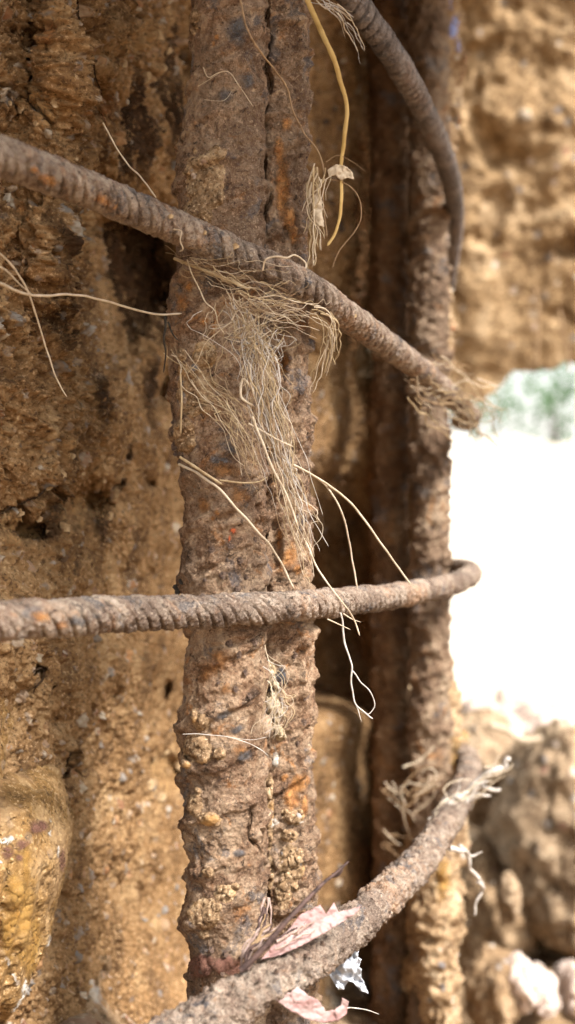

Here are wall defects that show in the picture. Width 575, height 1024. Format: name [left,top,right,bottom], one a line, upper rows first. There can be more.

spalling [171,0,315,267]
spalling [367,46,454,377]
corrosion [201,639,252,699]
spalling [147,619,323,1002]
spalling [165,246,319,596]
corrosion [276,531,300,574]
corrosion [282,775,308,812]
corrosion [351,843,376,915]
corrosion [357,613,372,666]
corrosion [361,562,373,585]
spalling [366,352,454,586]
spalling [368,595,455,881]